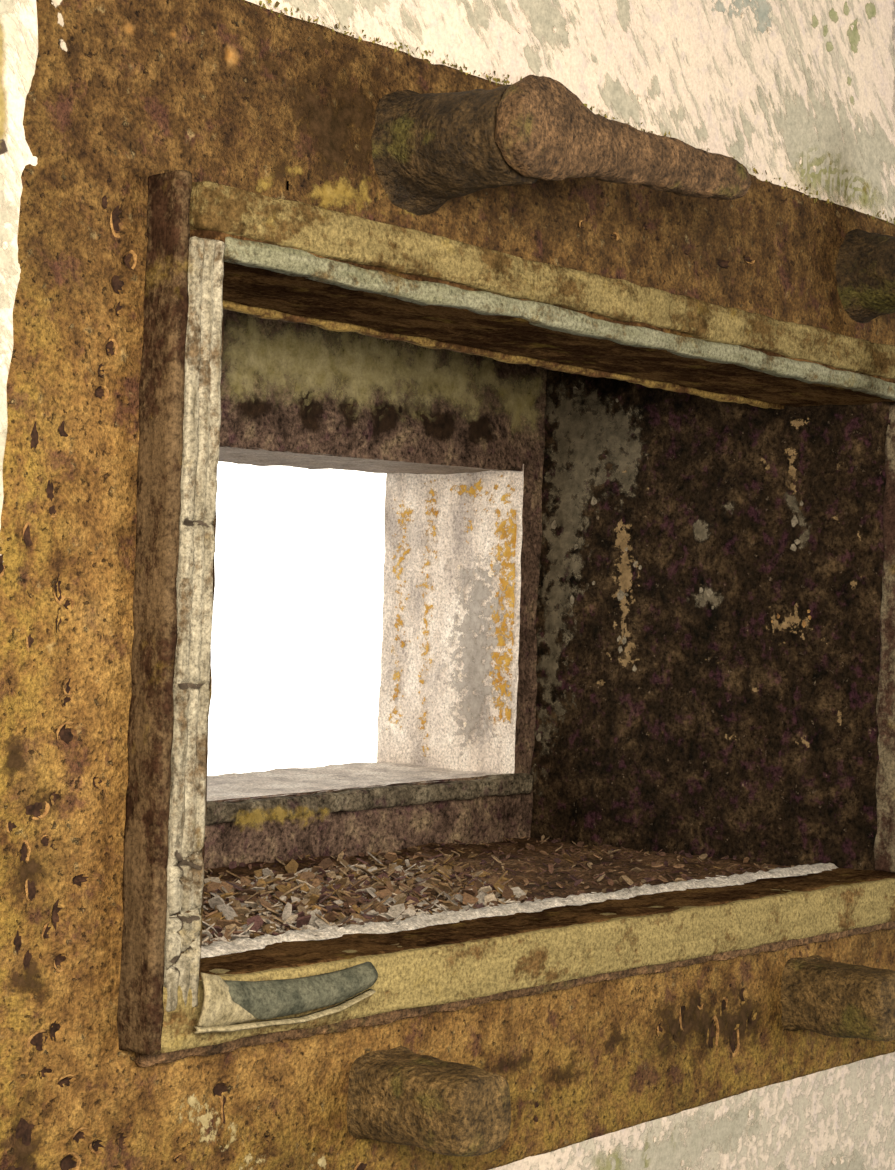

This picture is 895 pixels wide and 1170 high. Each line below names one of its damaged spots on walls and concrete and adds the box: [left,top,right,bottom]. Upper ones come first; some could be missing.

corrosion [311,180,370,210]
water stain [225,316,543,445]
peeling [532,374,653,795]
corrosion [386,475,517,757]
peeling [766,603,827,644]
peeling [436,553,513,761]
corrosion [6,739,26,777]
corrosion [237,806,328,829]
corrosion [13,859,47,892]
corrosion [9,961,44,1002]
corrosion [656,989,776,1066]
corrosion [174,1094,236,1151]